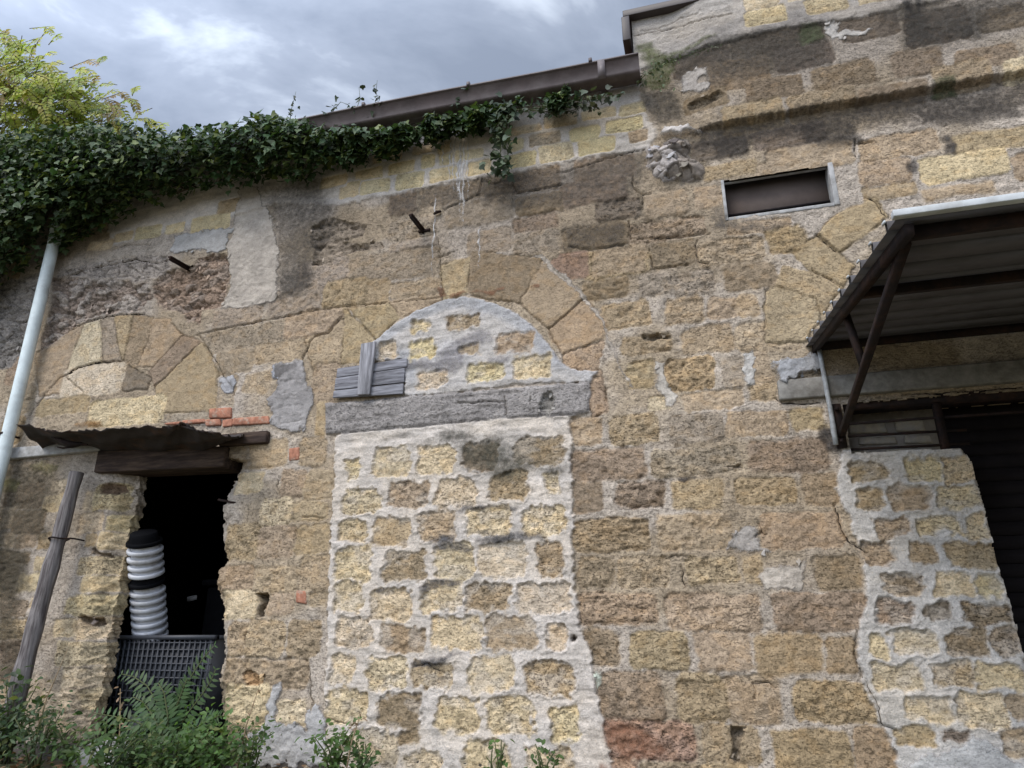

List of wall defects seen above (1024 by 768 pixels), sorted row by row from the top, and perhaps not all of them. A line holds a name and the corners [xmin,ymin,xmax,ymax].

spalling [310,217,385,266]
peeling [41,183,280,351]
spalling [100,482,130,495]